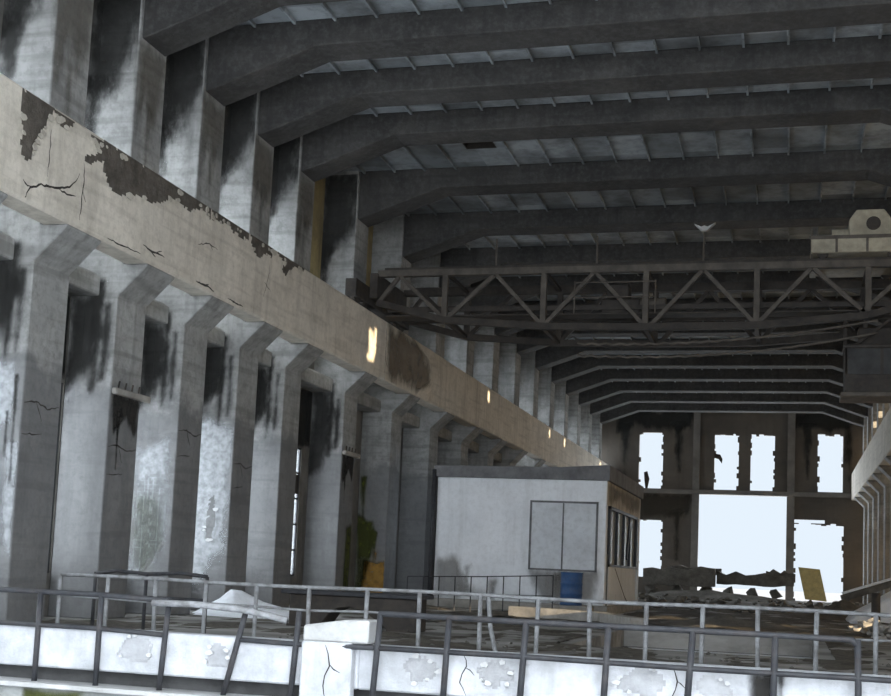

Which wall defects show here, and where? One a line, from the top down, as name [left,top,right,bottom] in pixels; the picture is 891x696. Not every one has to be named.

water stain [2,21,20,77]
spalling [20,88,76,161]
water stain [85,80,104,132]
crack [23,130,86,220]
spalling [85,134,304,276]
water stain [62,298,70,372]
water stain [88,280,110,392]
water stain [388,329,430,391]
crack [322,645,339,695]